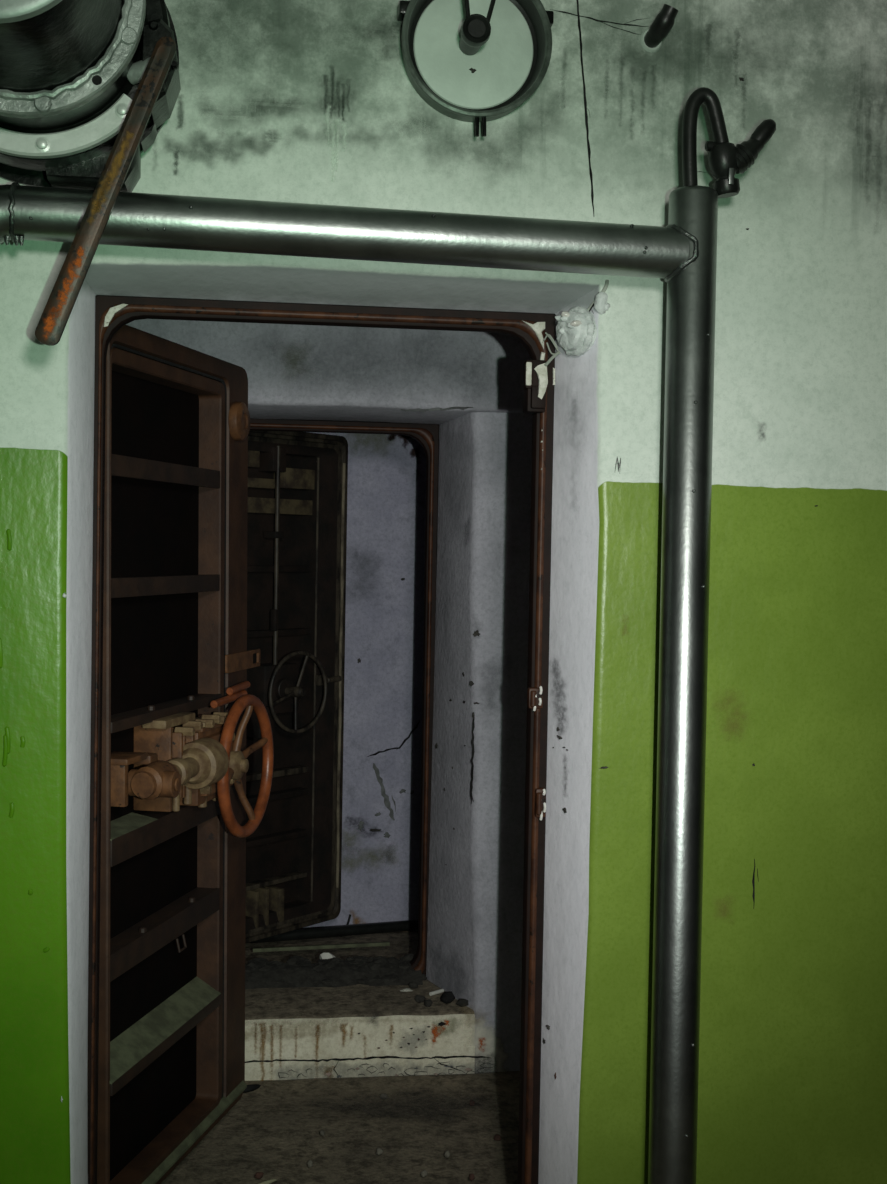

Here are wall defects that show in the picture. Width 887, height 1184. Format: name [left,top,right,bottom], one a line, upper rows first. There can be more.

crack [550,0,649,215]
crack [367,721,420,757]
rust [255,1024,282,1081]